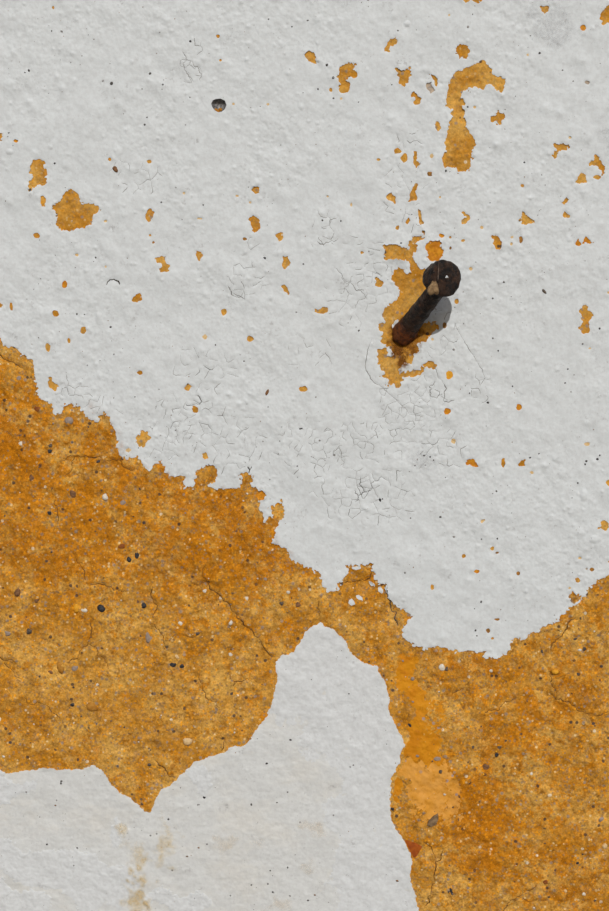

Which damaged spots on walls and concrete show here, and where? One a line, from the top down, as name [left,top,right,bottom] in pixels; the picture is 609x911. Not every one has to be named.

peeling [394,44,506,174]
peeling [28,159,107,232]
crack [227,237,263,299]
crack [312,212,392,320]
peeling [375,183,465,388]
crack [51,299,488,524]
peeling [0,338,609,911]